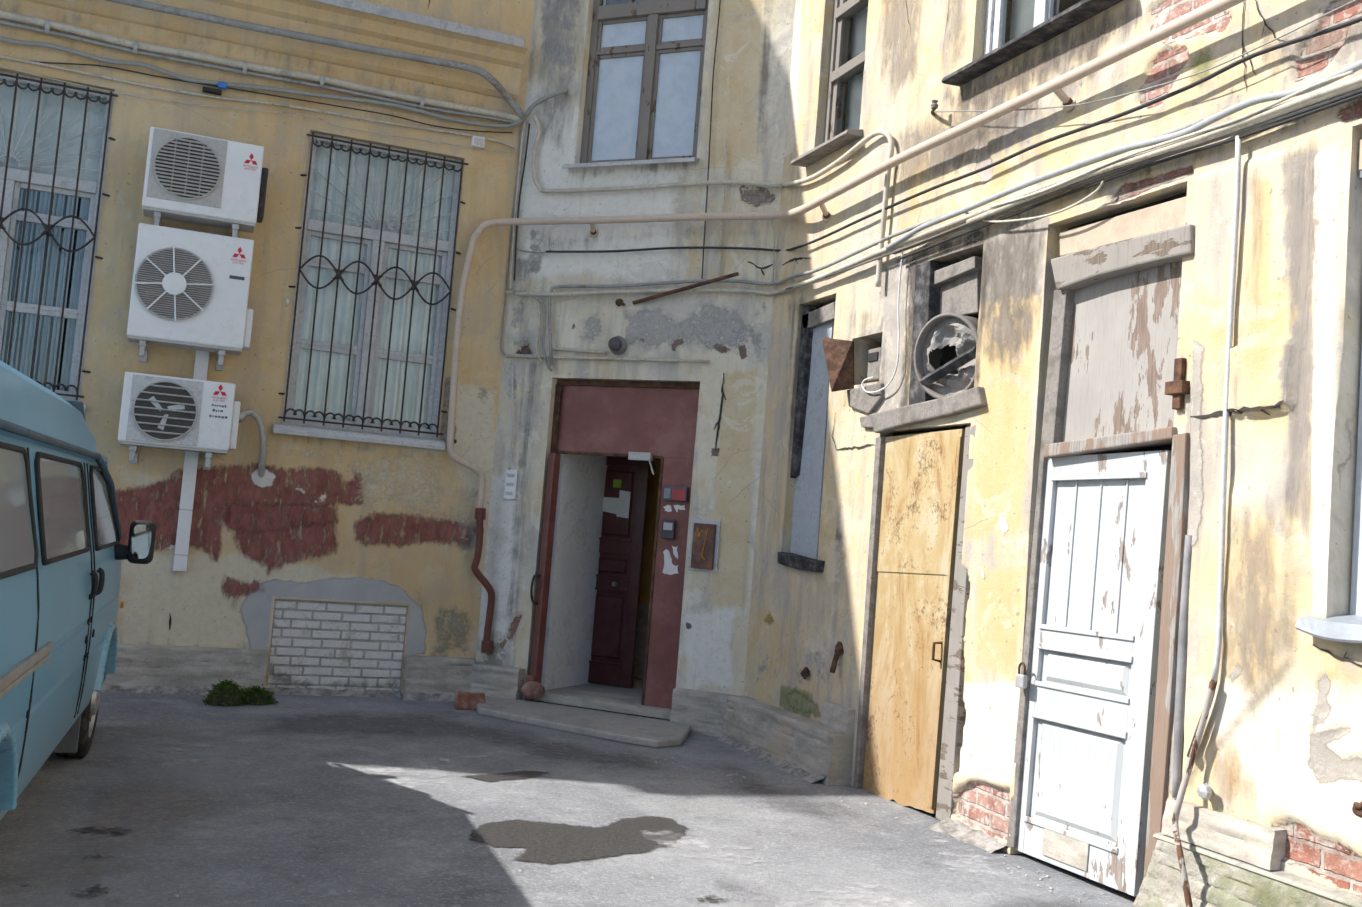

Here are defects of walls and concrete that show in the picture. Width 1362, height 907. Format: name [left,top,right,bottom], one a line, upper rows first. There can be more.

flaking render [1139,0,1232,109]
flaking render [1294,0,1362,81]
flaking render [740,185,776,207]
leakage [1284,147,1313,526]
peeling [1186,340,1204,546]
crack [1190,400,1284,419]
peeling [221,469,338,598]
peeling [354,513,470,547]
crack [1313,644,1362,667]
peeling [1308,674,1362,783]
flaking render [951,781,1010,845]
flaking render [1271,822,1362,897]